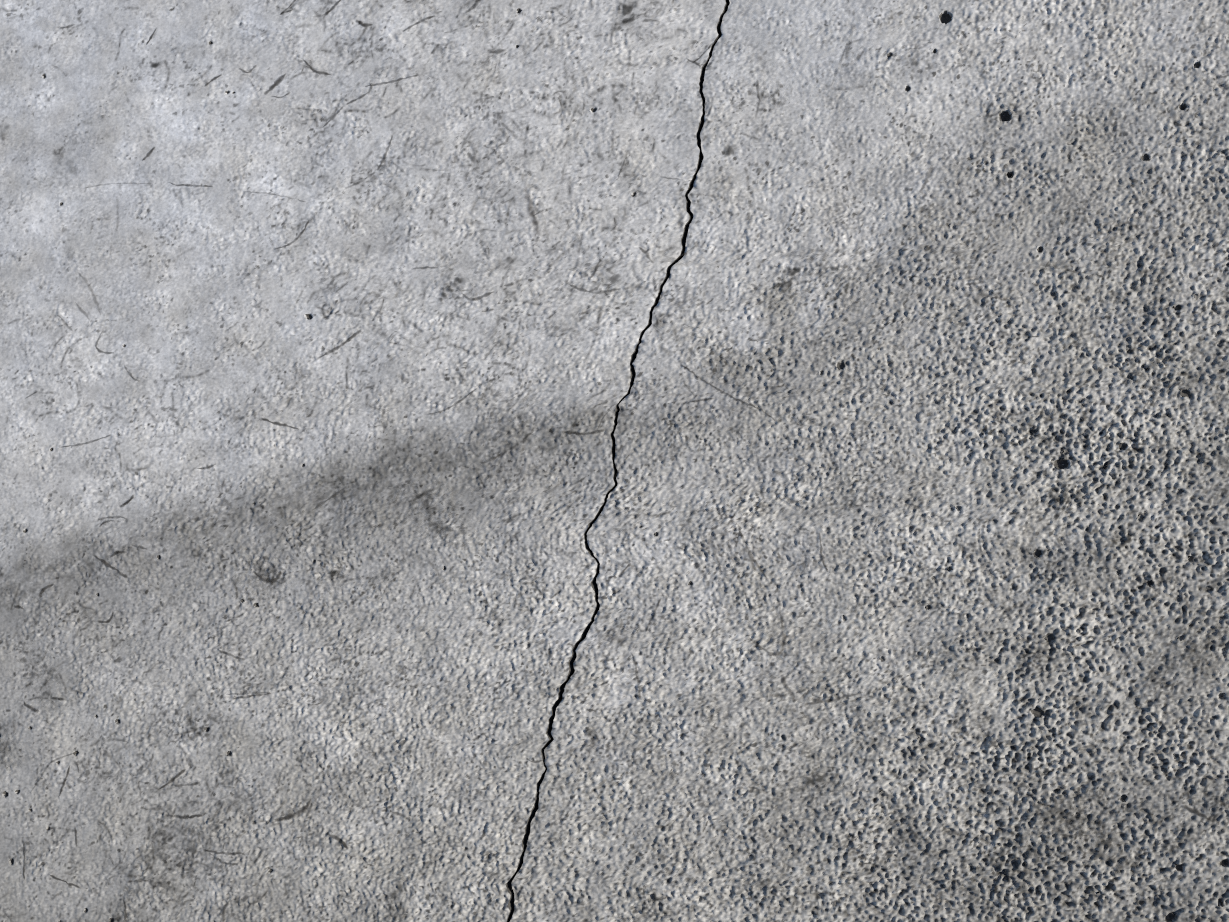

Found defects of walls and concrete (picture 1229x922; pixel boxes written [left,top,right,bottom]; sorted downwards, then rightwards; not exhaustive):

crack [505,0,730,922]